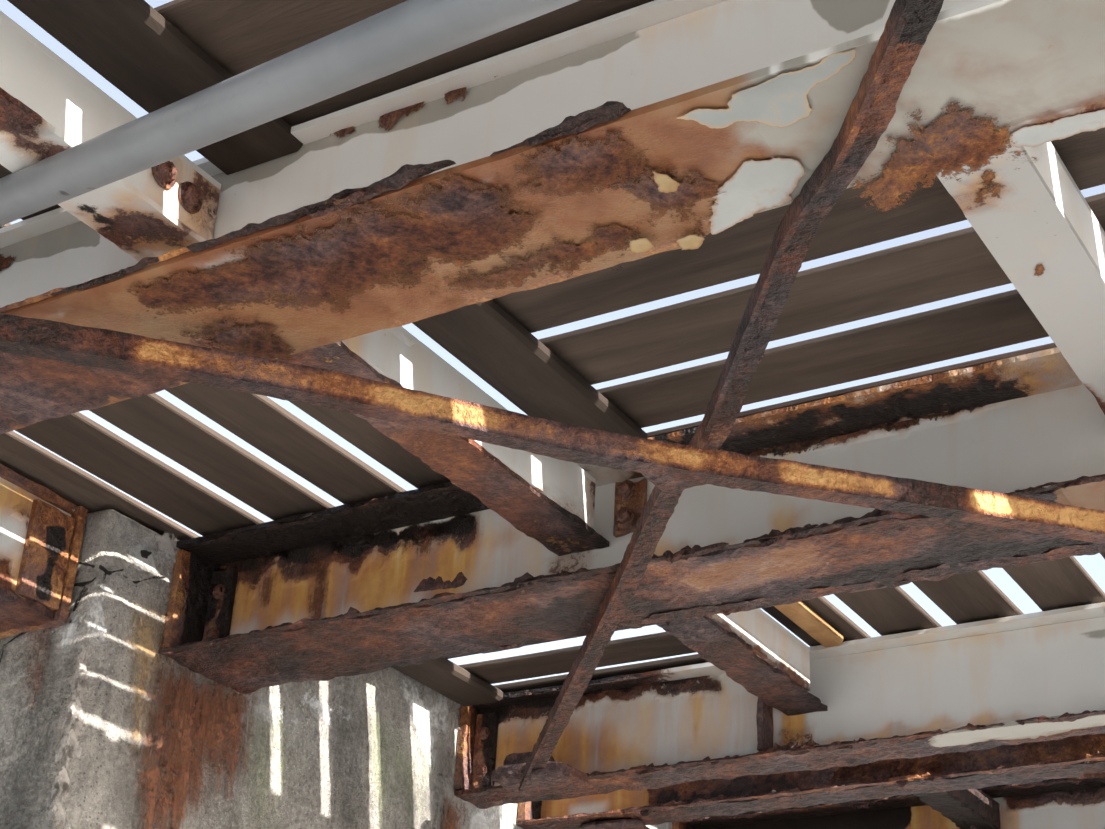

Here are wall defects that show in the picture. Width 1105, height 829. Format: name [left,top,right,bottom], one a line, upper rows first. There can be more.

peeling [676,49,856,129]
corrosion [379,102,424,131]
corrosion [851,101,1037,212]
peeling [653,172,681,193]
peeling [676,157,805,250]
corrosion [50,108,725,361]
peeling [629,238,655,253]
peeling [1004,476,1105,497]
corrosion [652,542,728,564]
crack [73,562,168,612]
corrosion [935,717,1050,735]
corrosion [829,760,951,810]